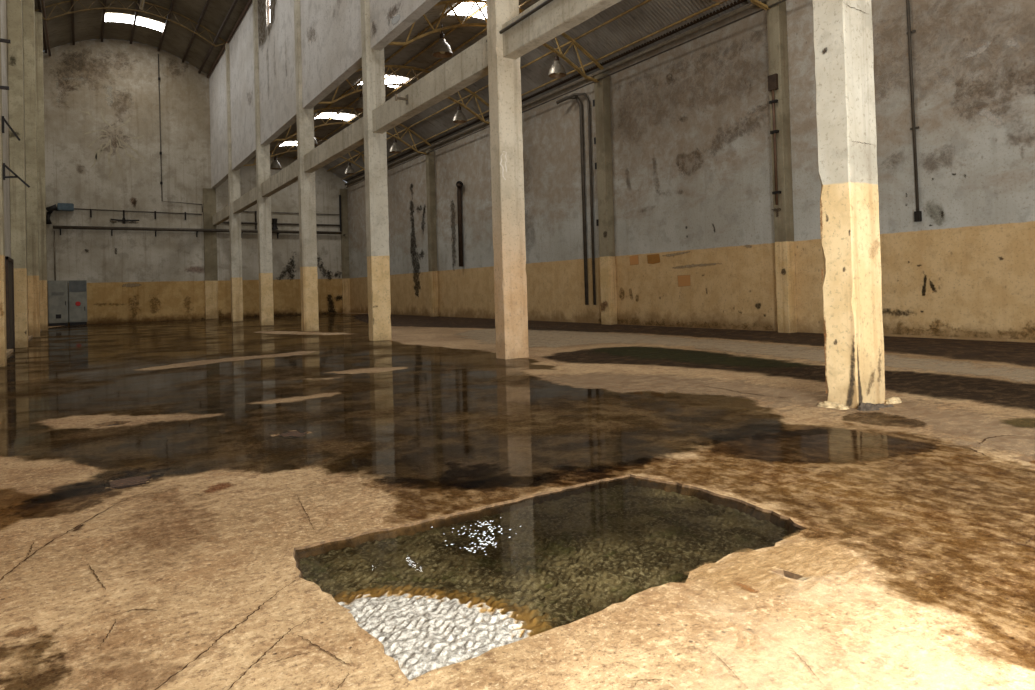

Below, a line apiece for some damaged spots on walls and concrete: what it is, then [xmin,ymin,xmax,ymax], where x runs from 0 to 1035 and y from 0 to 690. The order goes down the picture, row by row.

leakage [410,184,426,297]
leakage [882,308,939,336]
crack [0,482,167,581]
crack [98,609,153,649]
crack [155,580,296,690]
crack [228,617,351,690]
spalling [293,474,857,681]
leakage [380,412,1035,667]